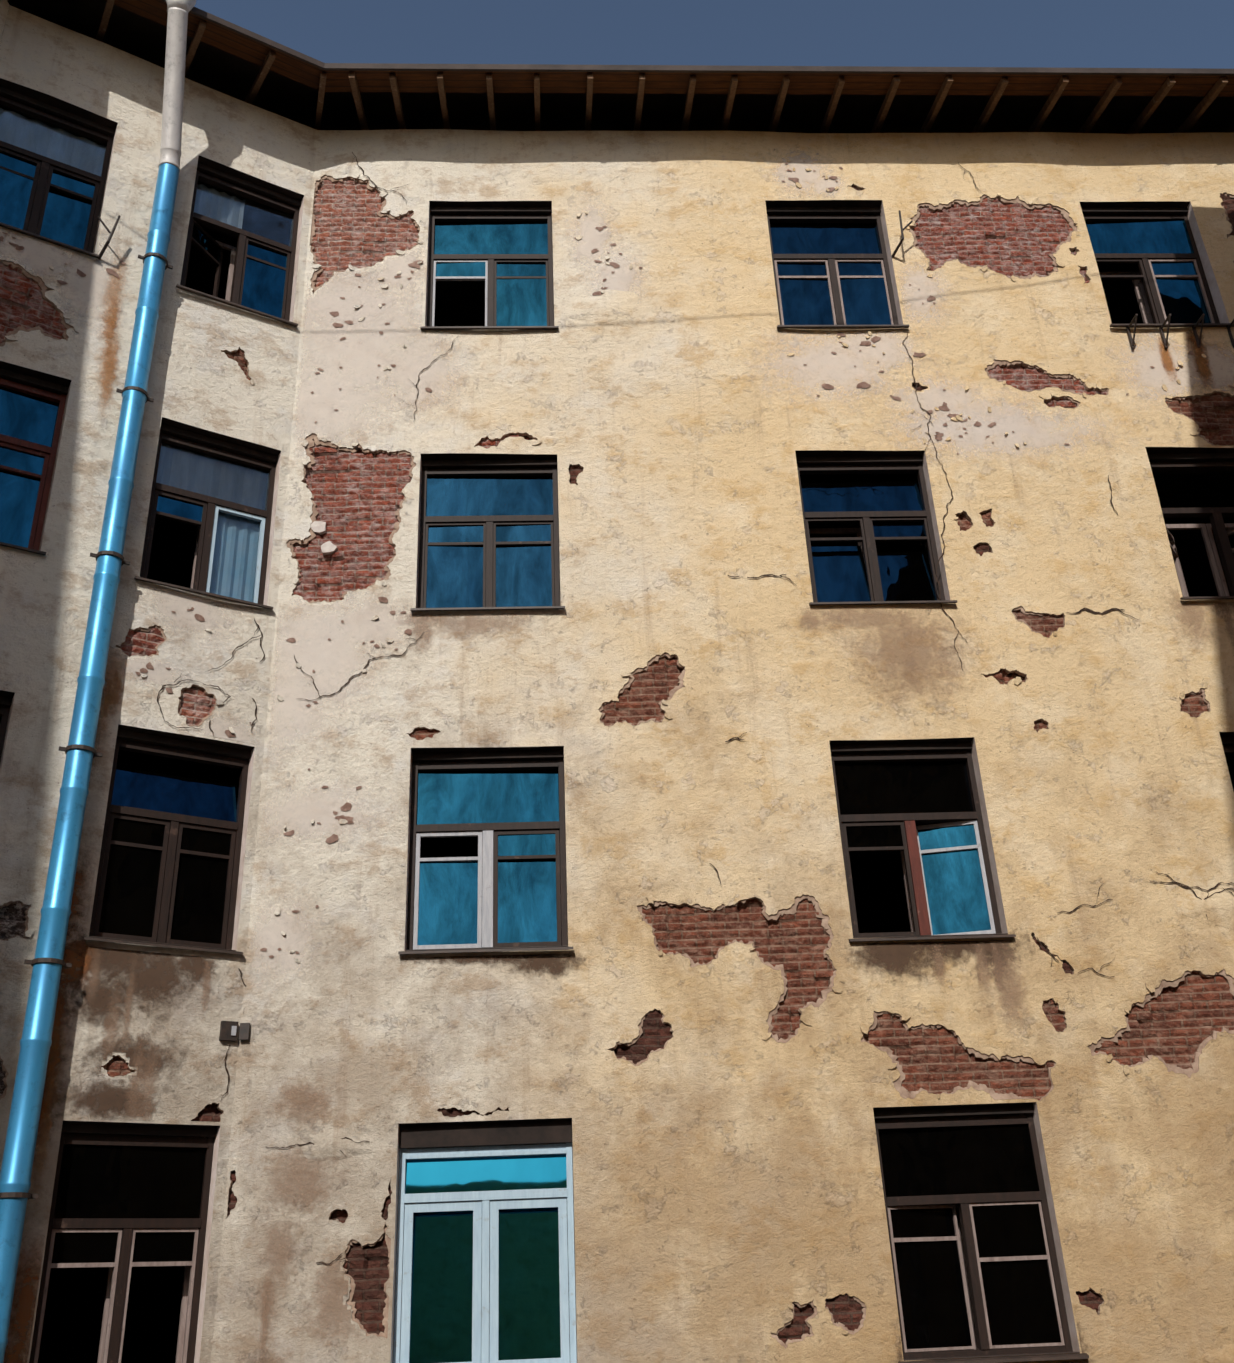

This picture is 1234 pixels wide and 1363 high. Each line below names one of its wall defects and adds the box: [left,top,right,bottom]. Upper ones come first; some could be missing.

spalling [903,192,1091,317]
spalling [274,174,450,744]
crack [902,332,967,670]
crack [157,618,424,732]
spalling [598,652,685,727]
crack [1151,872,1234,919]
leakage [65,938,214,1118]
spalling [608,1009,673,1066]
spalling [637,894,843,1043]
spalling [860,1011,1056,1101]
spalling [1087,969,1234,1078]
spalling [343,1180,392,1339]